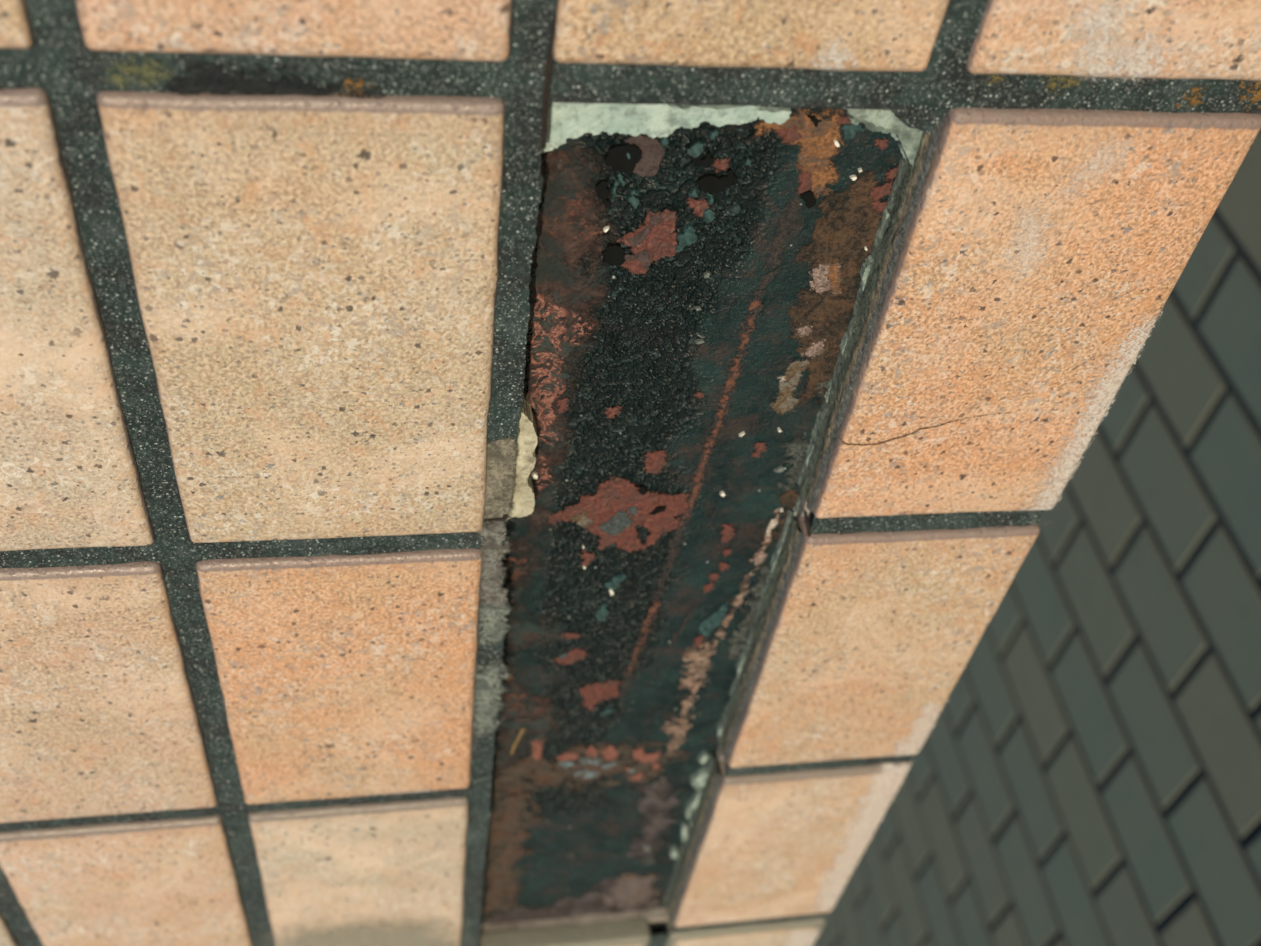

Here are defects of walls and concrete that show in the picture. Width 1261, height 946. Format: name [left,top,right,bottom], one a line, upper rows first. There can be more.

peeling [774,114,864,147]
peeling [595,128,751,274]
rust [755,109,883,415]
crack [838,412,1010,446]
peeling [476,437,516,646]
peeling [595,571,626,622]
peeling [547,450,690,569]
rust [480,146,783,925]
peeling [702,523,735,593]
peeling [554,614,588,666]
peeling [473,661,509,740]
peeling [578,680,622,716]